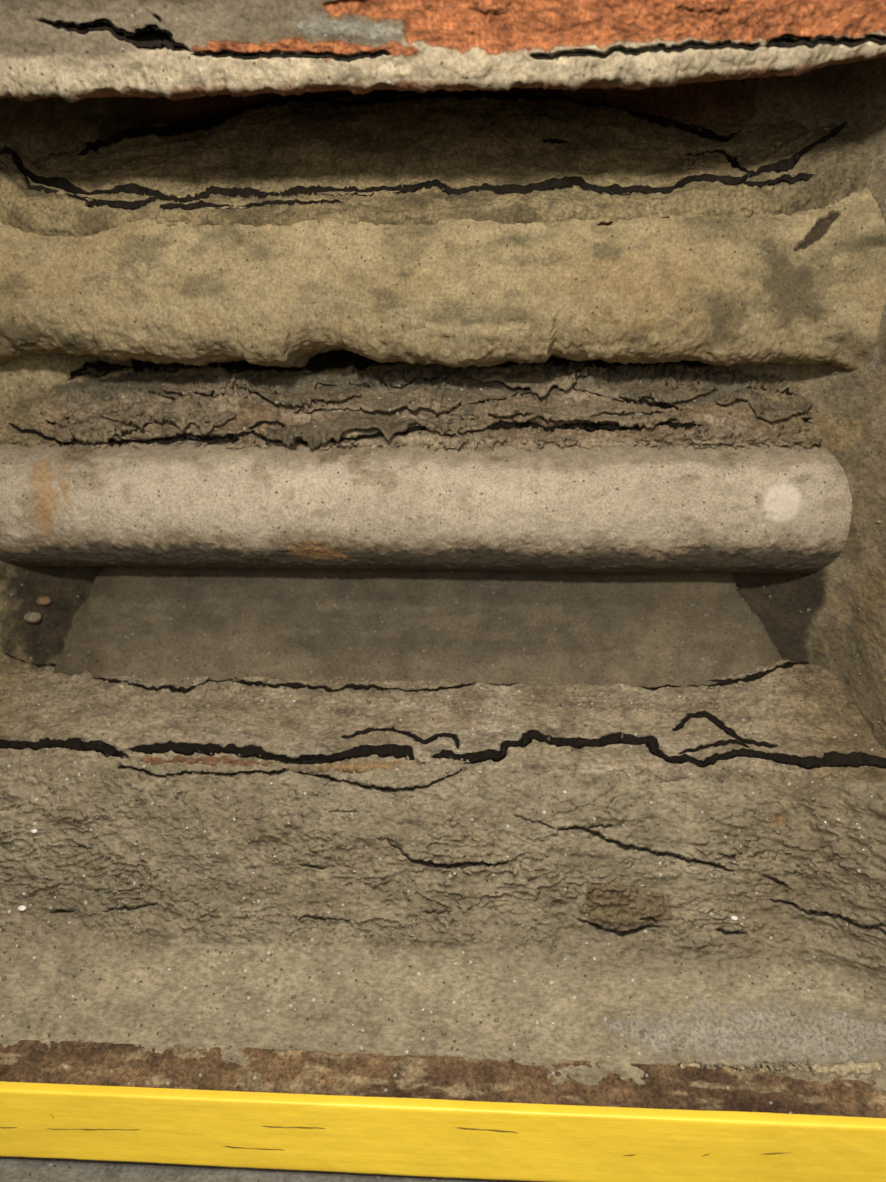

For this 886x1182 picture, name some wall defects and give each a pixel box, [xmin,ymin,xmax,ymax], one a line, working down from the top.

crack [37,14,390,61]
crack [530,35,886,59]
crack [0,92,848,225]
spalling [67,362,132,380]
crack [3,653,57,668]
crack [0,661,886,812]
crack [516,815,738,871]
crack [295,914,346,922]
crack [764,875,886,934]